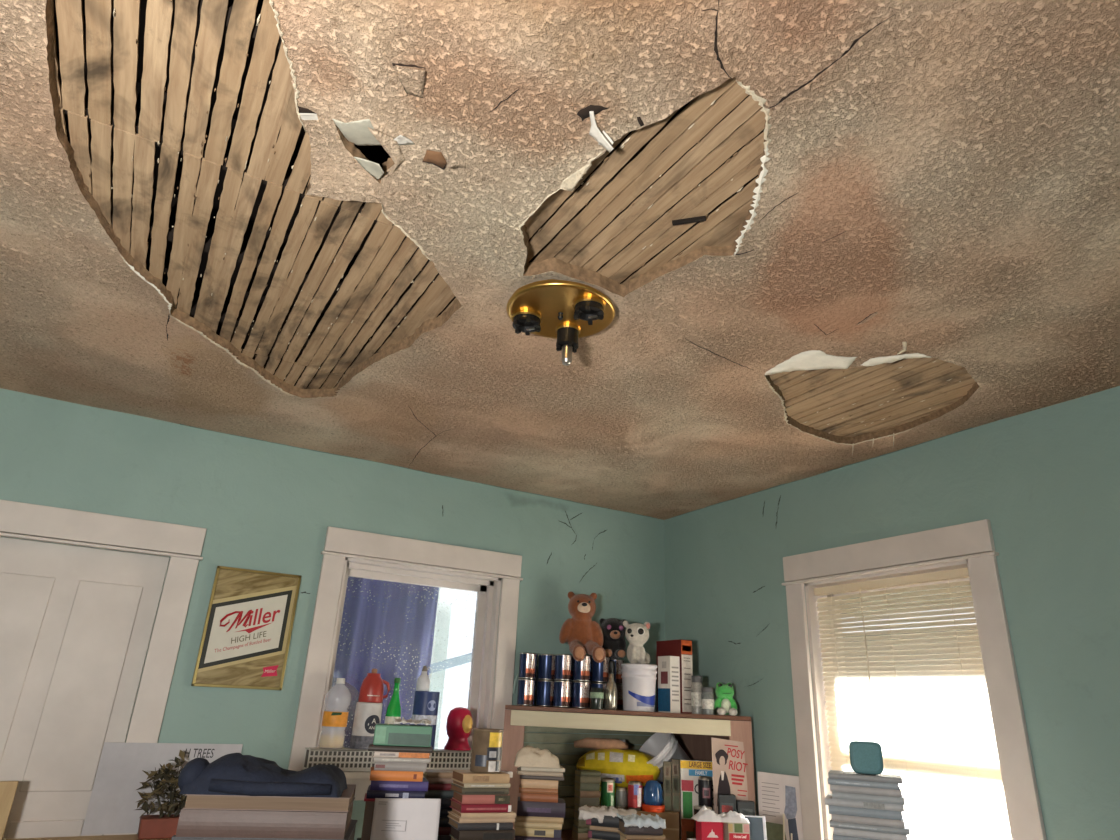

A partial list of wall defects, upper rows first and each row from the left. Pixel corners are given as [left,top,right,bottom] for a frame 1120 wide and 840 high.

crack [702,0,748,79]
crack [768,14,906,120]
spalling [51,0,474,396]
spalling [519,77,772,285]
spalling [765,341,975,455]
crack [547,511,599,585]